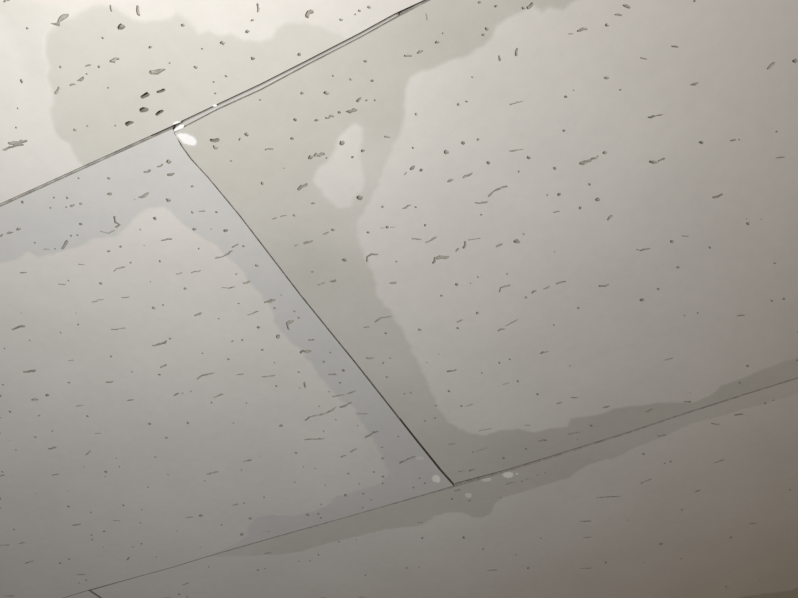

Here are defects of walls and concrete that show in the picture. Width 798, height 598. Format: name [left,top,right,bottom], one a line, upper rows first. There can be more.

damp [0,0,351,167]
damp [0,129,798,557]